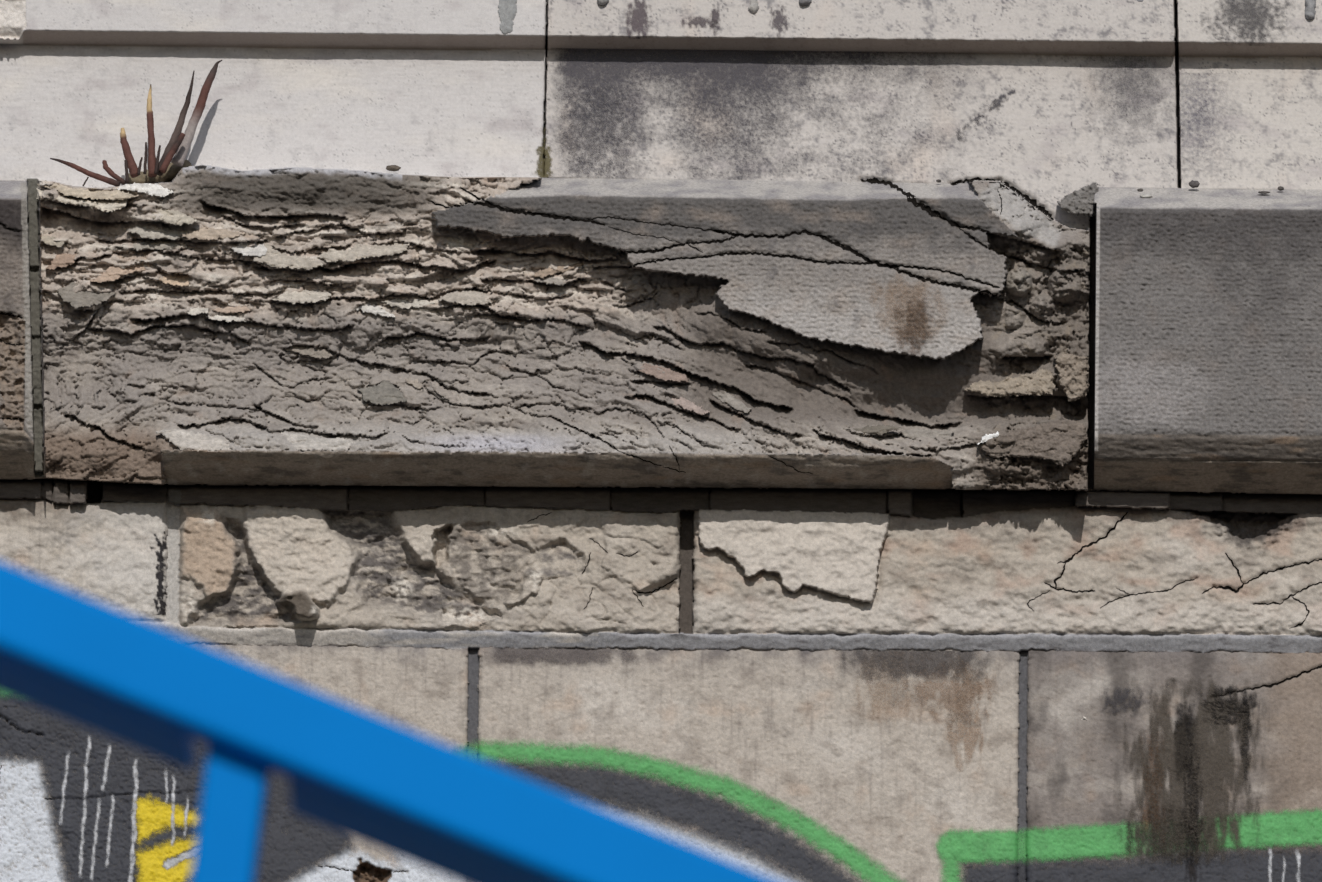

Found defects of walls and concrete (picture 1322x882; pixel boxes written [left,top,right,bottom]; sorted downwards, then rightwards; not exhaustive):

damp [558,0,933,179]
damp [957,90,1015,141]
damp [1101,56,1157,121]
crack [428,187,1001,297]
crack [861,177,1054,250]
crack [0,312,23,345]
spalling [36,165,1091,492]
spalling [179,505,320,628]
spalling [324,511,590,625]
peeling [698,509,890,603]
crack [1027,512,1322,629]
damp [1106,677,1259,880]